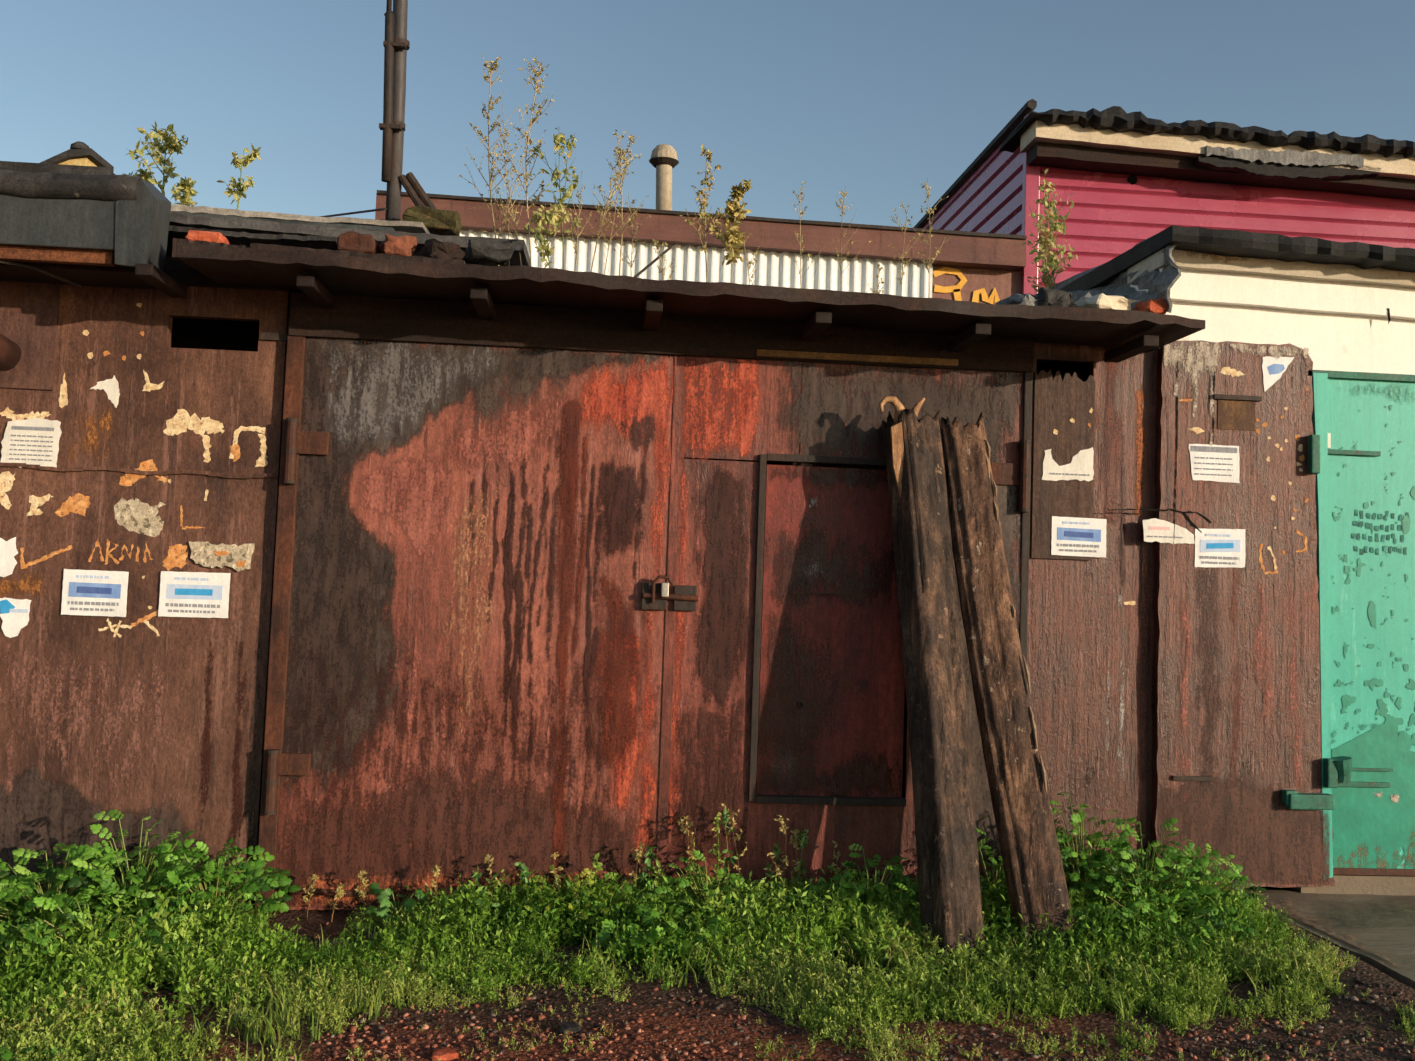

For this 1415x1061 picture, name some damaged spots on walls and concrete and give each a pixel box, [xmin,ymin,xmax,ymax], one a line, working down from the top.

rust [73,412,111,452]
rust [0,573,44,598]
rust [0,641,175,803]
rust [199,643,213,830]
rust [227,642,261,903]
rust [274,359,760,909]
rust [1096,347,1153,783]
rust [1175,567,1273,783]
peeling [1332,441,1415,869]
rust [1337,832,1415,869]